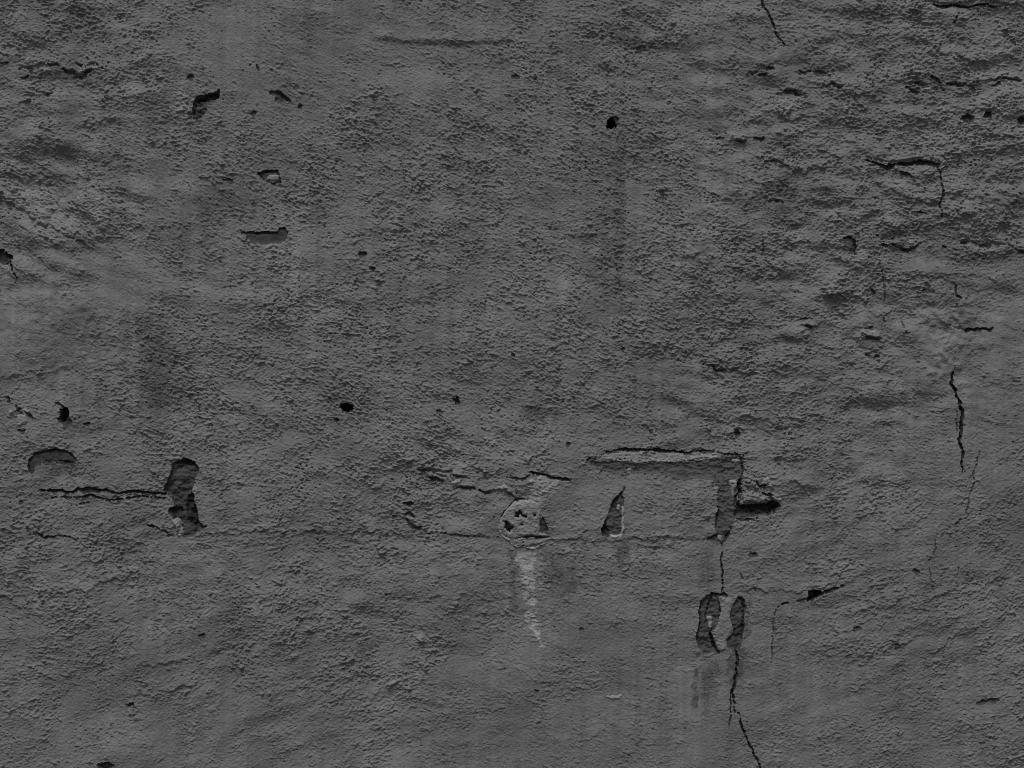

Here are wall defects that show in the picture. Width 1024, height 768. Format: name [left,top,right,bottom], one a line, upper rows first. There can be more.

spalling [192,89,220,120]
crack [866,159,945,218]
spalling [241,227,288,245]
crack [39,487,171,506]
spalling [163,457,207,537]
crack [200,471,572,538]
peeling [497,475,561,550]
spalling [586,448,784,545]
crack [929,372,980,593]
efflorescence [514,546,546,648]
spalling [696,592,747,655]
crack [728,650,761,768]